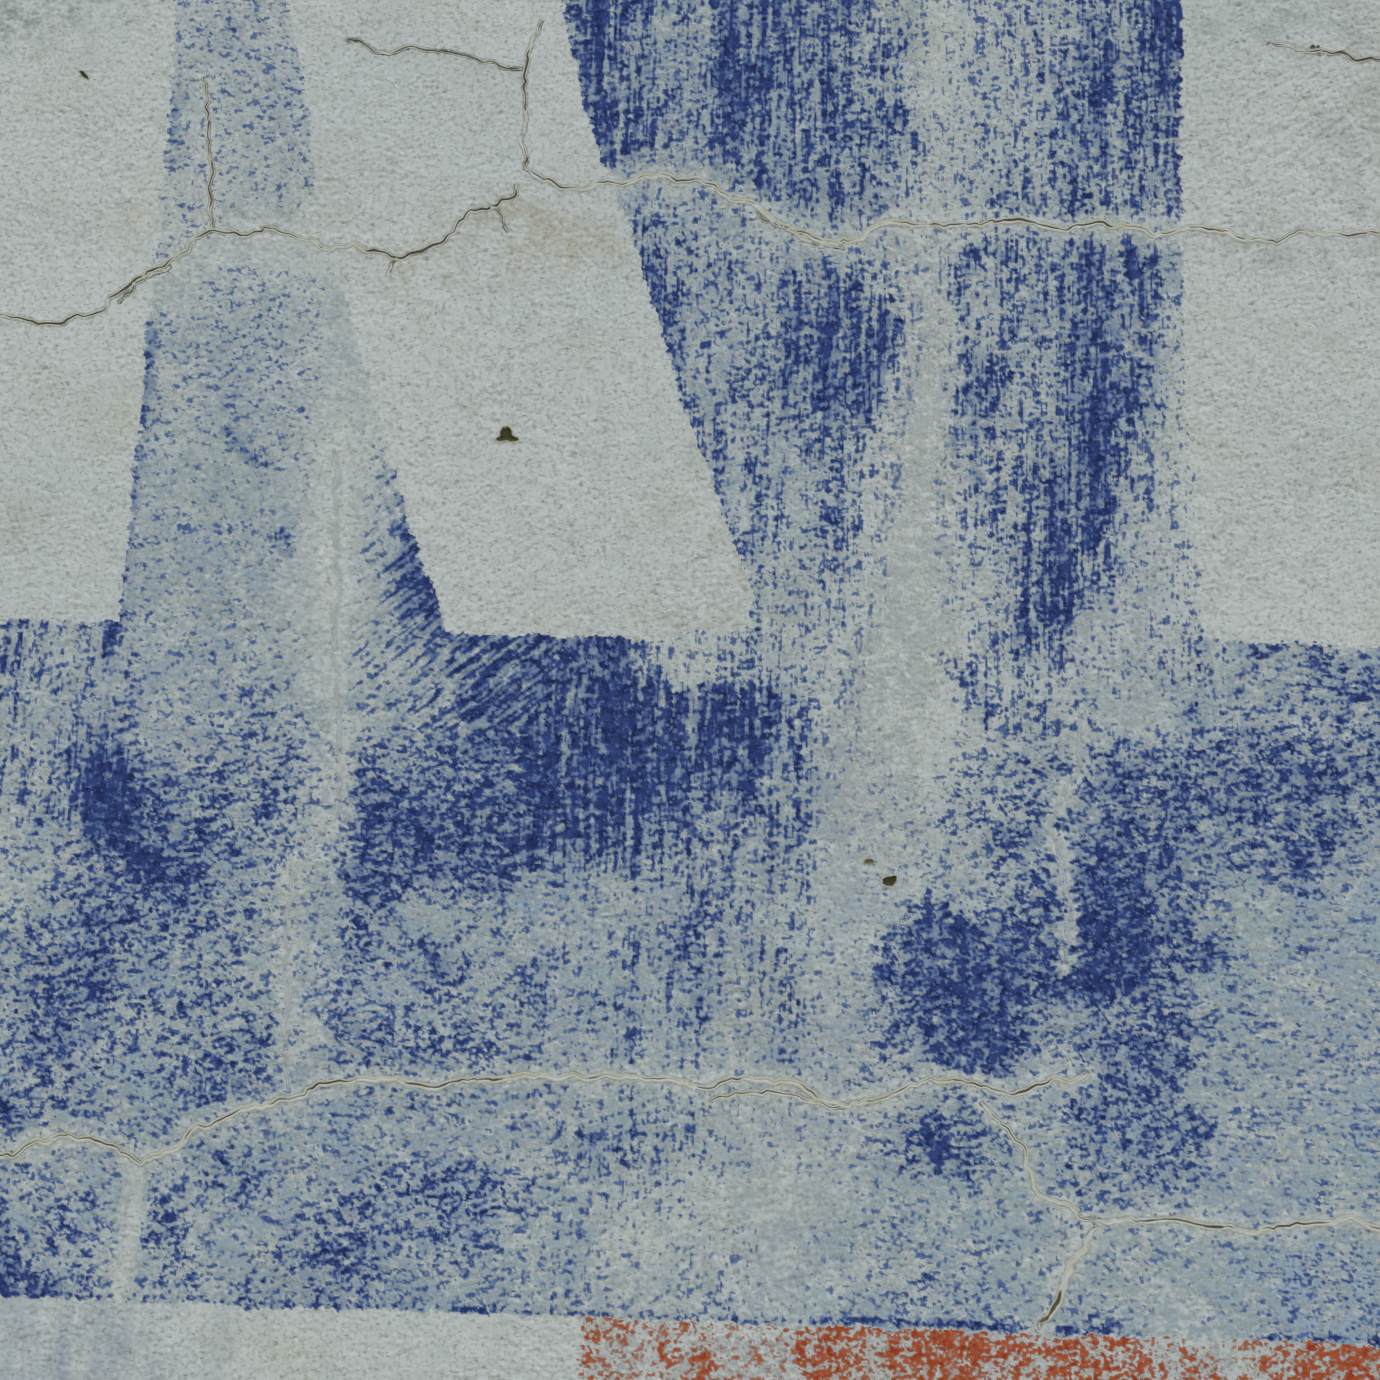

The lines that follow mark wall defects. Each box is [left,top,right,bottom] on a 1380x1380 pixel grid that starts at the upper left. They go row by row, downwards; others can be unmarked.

crack [0,18,1380,326]
crack [0,1071,1380,1329]